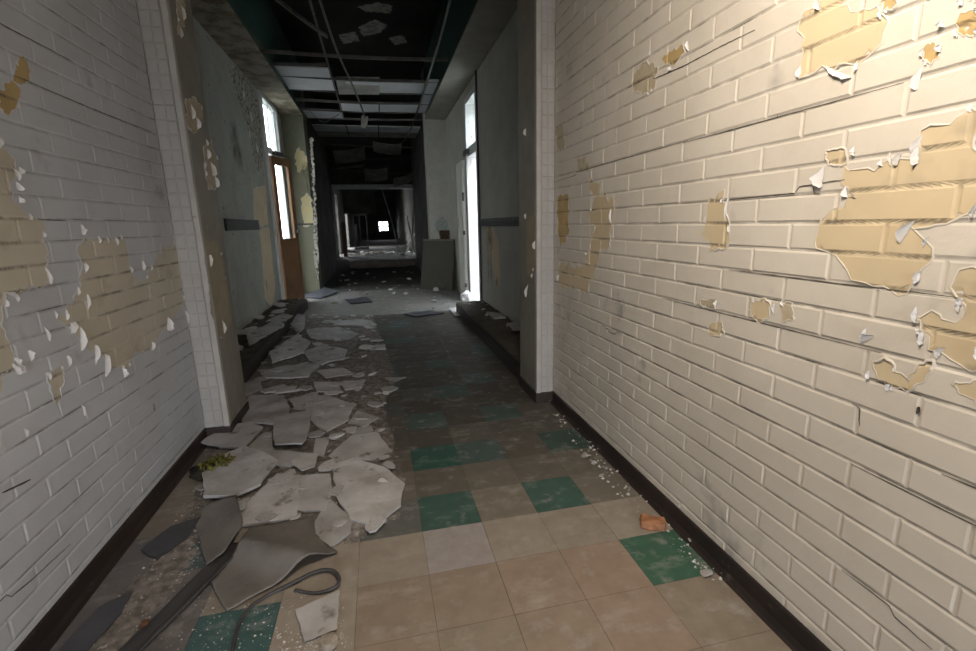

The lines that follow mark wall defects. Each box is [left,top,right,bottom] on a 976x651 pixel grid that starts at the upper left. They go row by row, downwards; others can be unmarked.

peeling [0,55,31,116]
flaking render [339,2,407,45]
peeling [632,41,689,96]
peeling [795,0,900,80]
peeling [909,41,941,90]
peeling [935,0,976,38]
peeling [557,156,616,295]
peeling [701,189,731,252]
peeling [810,103,976,297]
peeling [0,138,54,395]
peeling [54,224,189,378]
peeling [864,266,976,406]